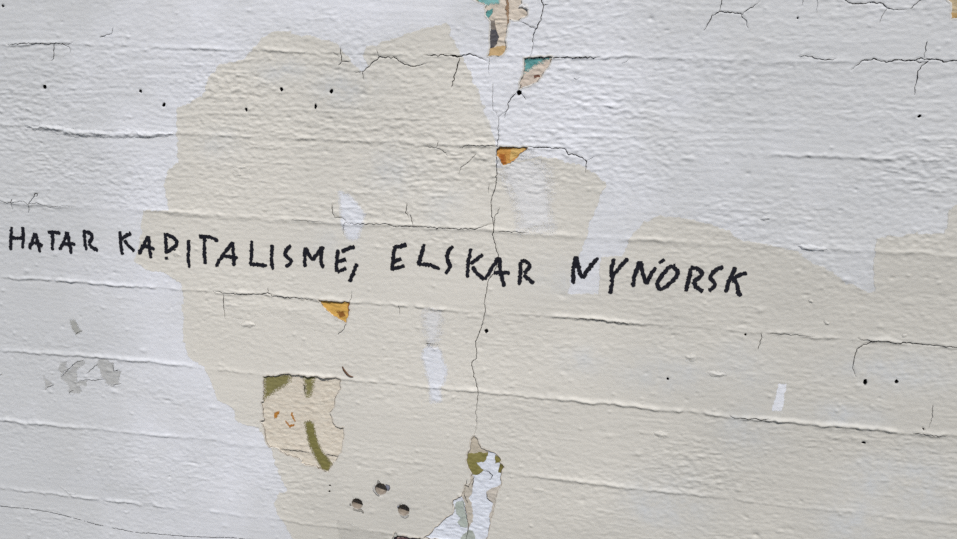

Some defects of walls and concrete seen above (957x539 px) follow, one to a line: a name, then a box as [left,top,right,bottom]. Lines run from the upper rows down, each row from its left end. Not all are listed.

peeling [473,0,529,58]
crack [523,0,596,59]
crack [846,0,920,21]
crack [340,48,490,88]
peeling [518,54,554,90]
crack [800,43,957,86]
peeling [495,145,529,167]
crack [531,146,594,171]
crack [299,93,526,434]
peeling [317,299,352,324]
peeling [259,372,345,473]
peeling [390,434,505,539]